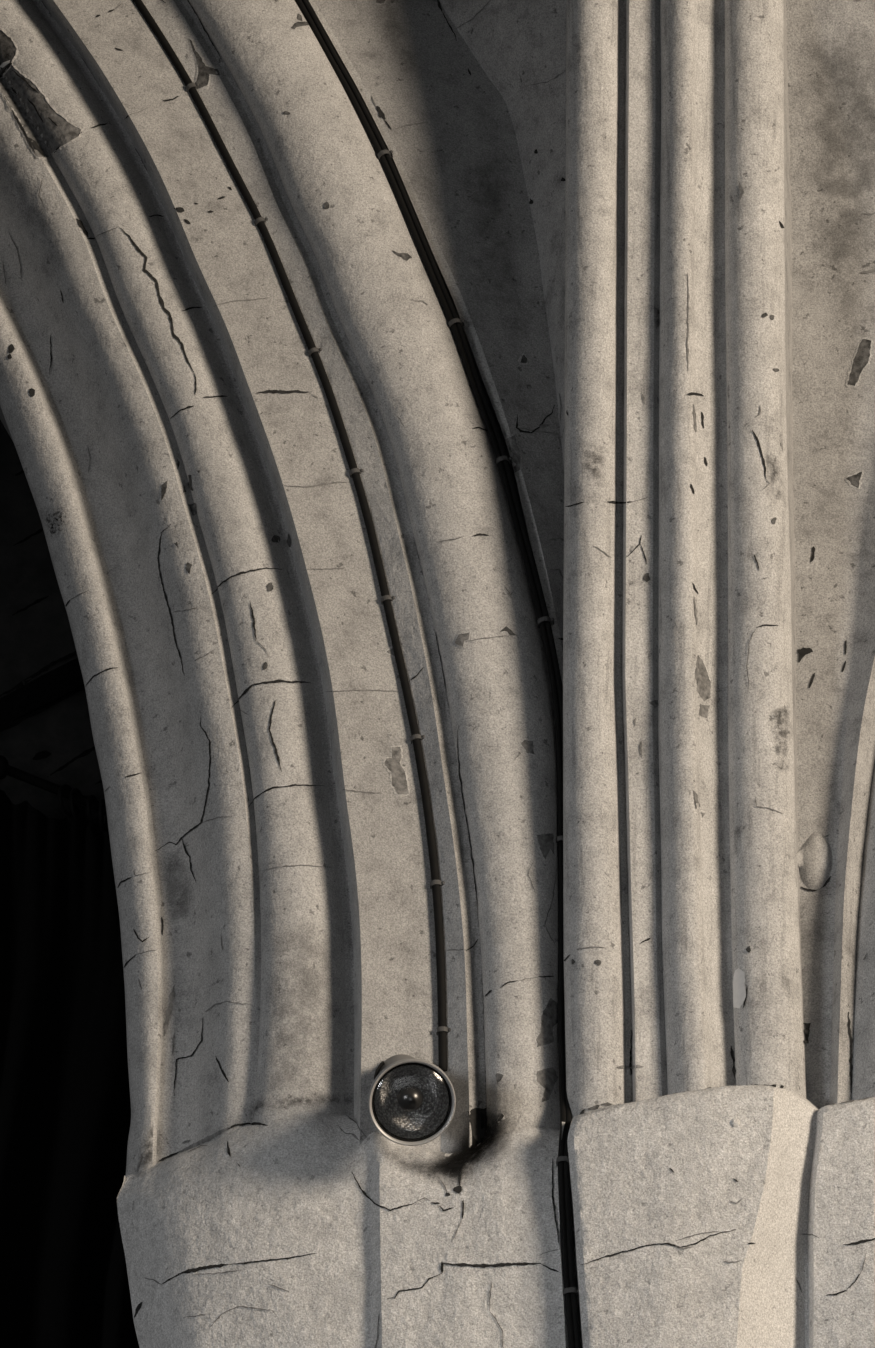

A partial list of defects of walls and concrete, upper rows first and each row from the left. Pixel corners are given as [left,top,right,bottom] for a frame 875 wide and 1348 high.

spalling [0,27,83,160]
crack [76,218,88,238]
crack [120,228,197,393]
crack [157,524,214,674]
crack [240,702,282,772]
crack [156,716,235,881]
crack [133,917,164,942]
crack [138,979,247,1089]
crack [339,1115,367,1141]
crack [352,1171,464,1242]